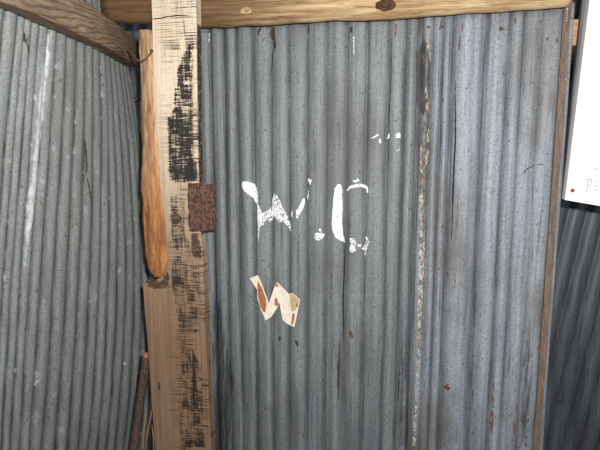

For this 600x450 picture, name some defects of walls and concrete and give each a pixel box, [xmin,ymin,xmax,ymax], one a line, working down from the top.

peeling [261,194,293,231]